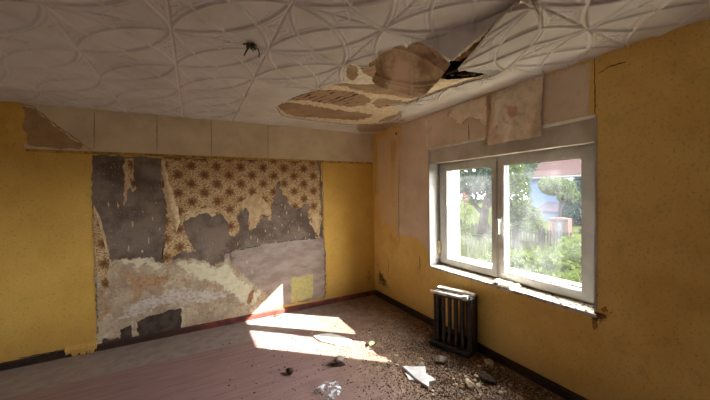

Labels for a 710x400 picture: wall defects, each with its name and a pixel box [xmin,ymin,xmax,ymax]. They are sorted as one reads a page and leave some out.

peeling [276,25,594,255]
crack [594,59,625,115]
peeling [64,154,327,356]
flaking render [592,306,612,330]